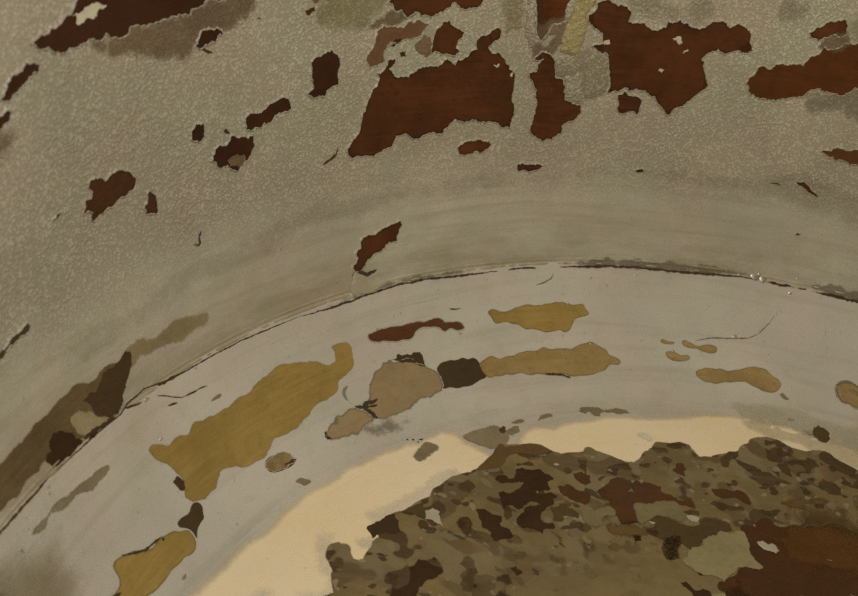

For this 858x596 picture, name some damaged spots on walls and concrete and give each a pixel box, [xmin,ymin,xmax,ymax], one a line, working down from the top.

peeling [0,0,226,132]
peeling [346,0,516,161]
peeling [525,0,753,143]
peeling [744,17,858,103]
peeling [82,166,159,223]
peeling [350,219,404,298]
peeling [367,317,465,343]
peeling [488,302,589,332]
peeling [324,342,621,441]
peeling [834,380,858,411]
peeling [113,342,354,596]
peeling [463,419,858,596]